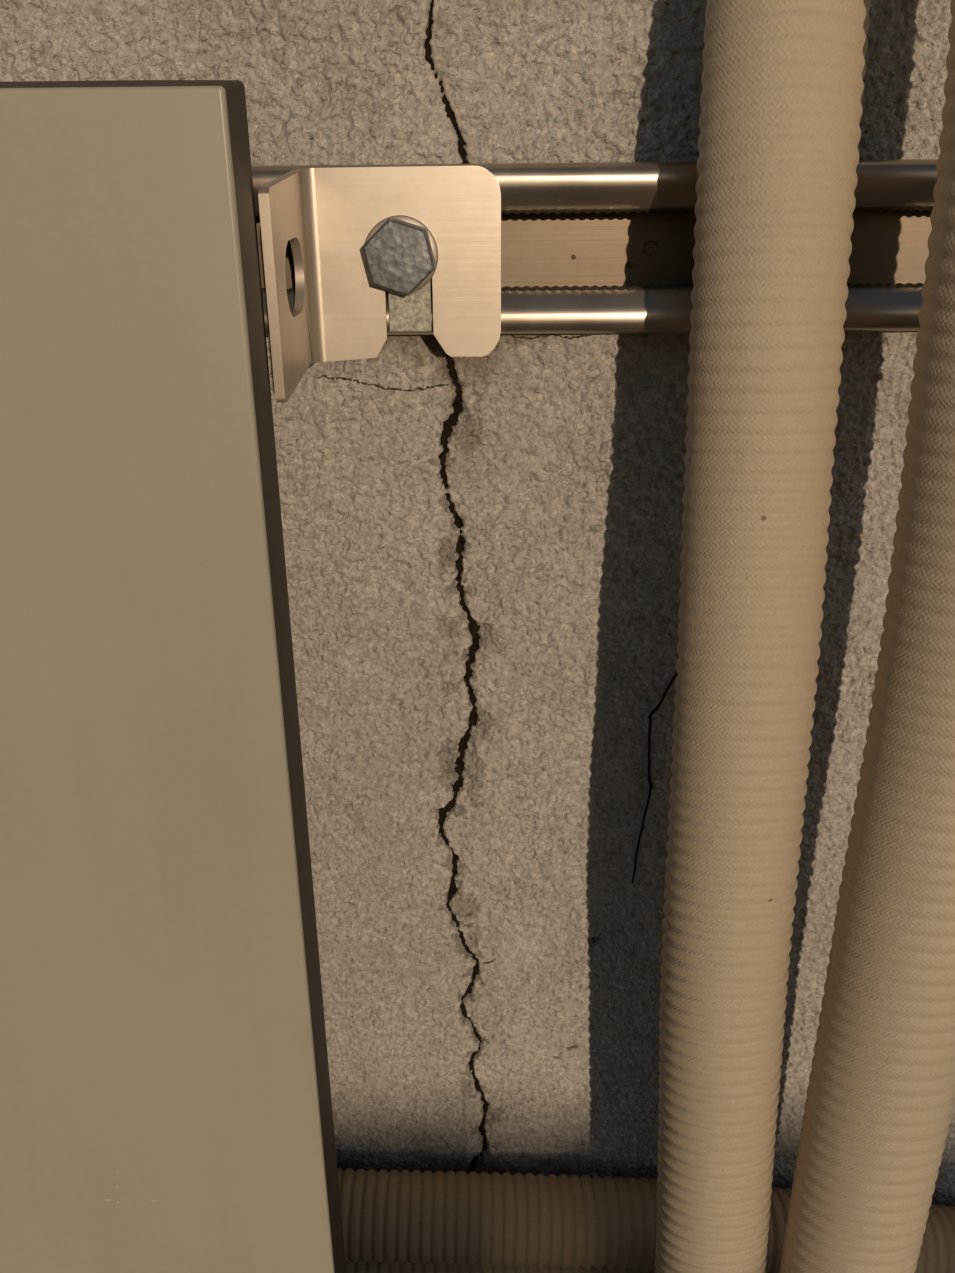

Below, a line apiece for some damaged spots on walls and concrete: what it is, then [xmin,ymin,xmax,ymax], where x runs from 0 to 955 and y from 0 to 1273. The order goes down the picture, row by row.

crack [424,0,478,164]
crack [510,333,596,341]
crack [314,354,494,1174]